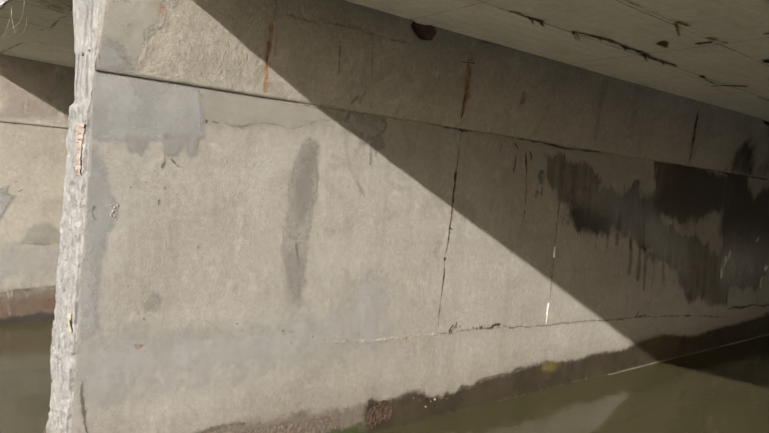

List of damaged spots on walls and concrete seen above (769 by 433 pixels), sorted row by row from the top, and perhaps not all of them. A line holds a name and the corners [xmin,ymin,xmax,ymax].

peeling [102,0,177,68]
crack [513,12,544,26]
crack [572,14,726,67]
water stain [80,147,118,337]
water stain [75,43,204,155]
water stain [282,138,318,298]
crack [430,124,552,335]
crack [507,136,601,219]
water stain [547,141,769,307]
crack [681,113,767,179]